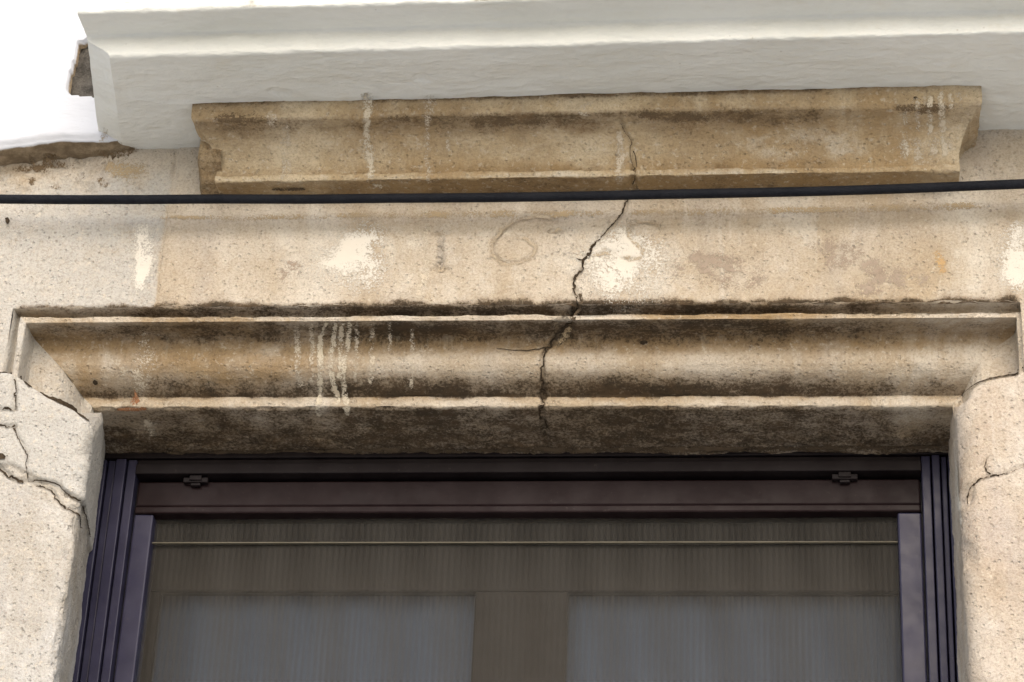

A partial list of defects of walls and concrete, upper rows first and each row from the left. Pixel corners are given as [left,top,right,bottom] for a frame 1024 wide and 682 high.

water stain [214,111,305,192]
water stain [360,93,382,189]
water stain [456,110,548,128]
water stain [638,108,765,125]
crack [497,124,637,430]
water stain [293,321,376,417]
crack [0,379,91,537]
crack [966,461,1022,504]